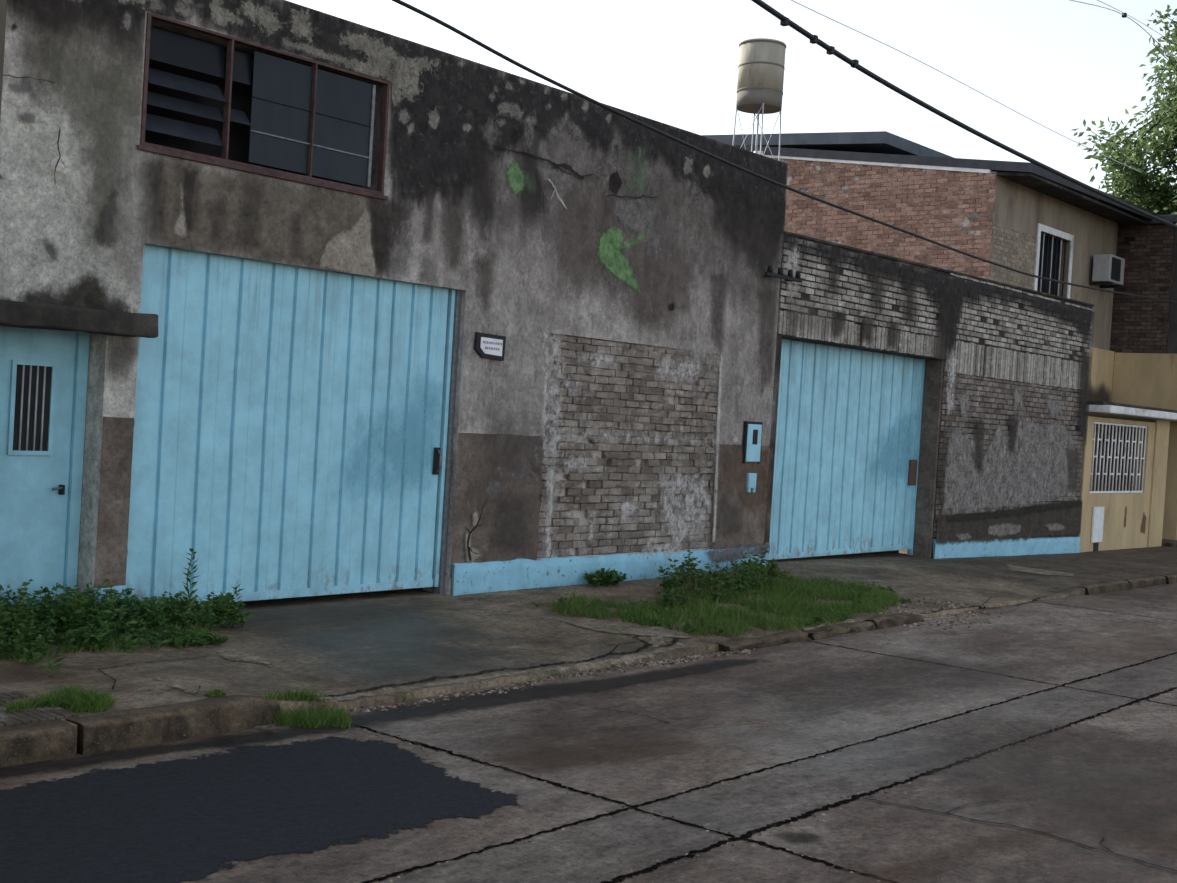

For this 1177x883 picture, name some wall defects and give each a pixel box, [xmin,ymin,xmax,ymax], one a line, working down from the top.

crack [493,144,658,213]
damp [2,0,1110,557]
crack [465,497,487,561]